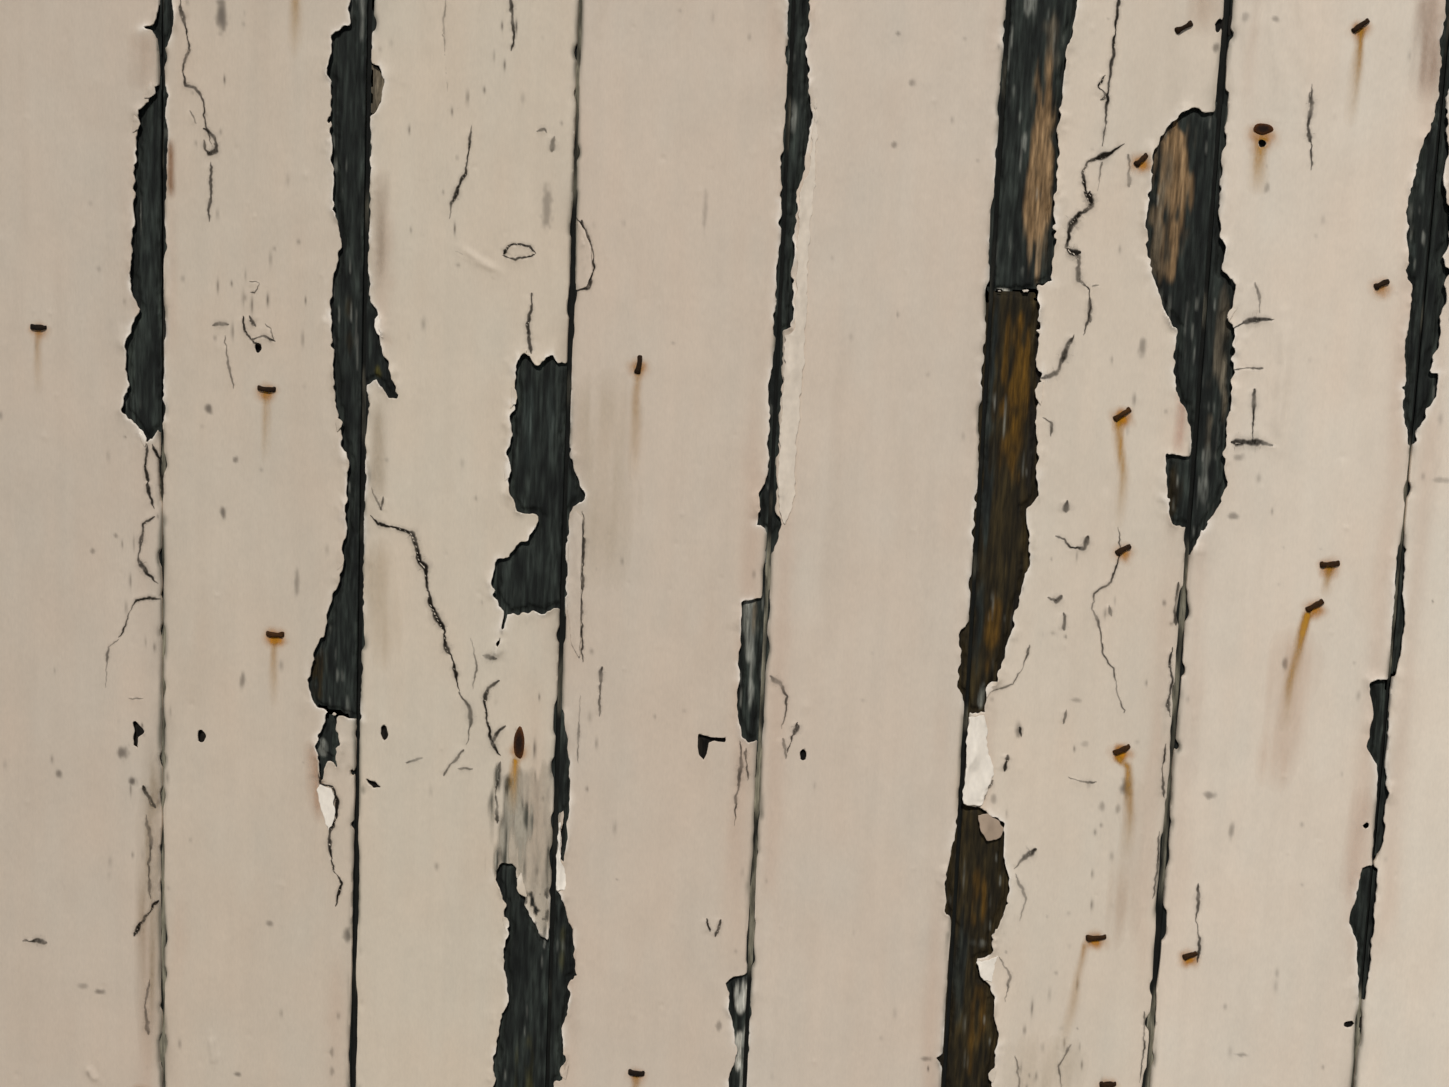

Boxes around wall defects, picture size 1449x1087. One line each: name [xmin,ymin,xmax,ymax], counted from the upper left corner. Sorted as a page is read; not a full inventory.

peeling [121,76,169,446]
peeling [308,0,398,830]
crack [370,497,506,823]
peeling [491,351,585,657]
peeling [757,0,818,565]
peeling [937,0,1077,1087]
crack [1041,0,1125,379]
rust [1116,411,1128,471]
peeling [1145,102,1238,555]
rust [1289,606,1321,686]
peeling [1402,0,1449,445]
peeling [493,697,577,1087]